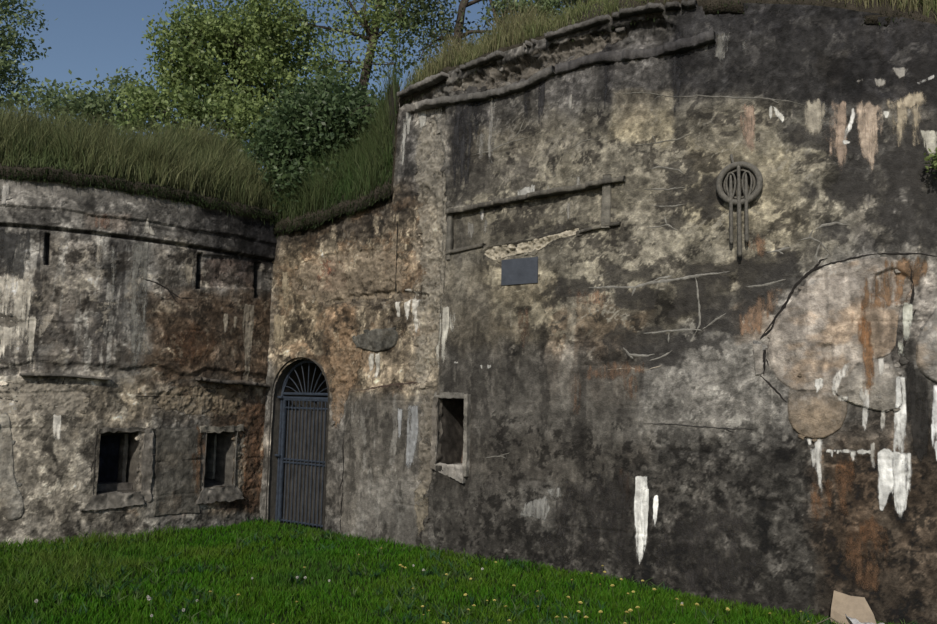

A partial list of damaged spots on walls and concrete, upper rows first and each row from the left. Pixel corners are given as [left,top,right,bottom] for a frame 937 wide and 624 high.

damp [0,230,55,360]
crack [589,271,730,371]
crack [747,222,936,401]
corrosion [858,257,928,390]
damp [807,302,937,515]
damp [521,474,761,601]